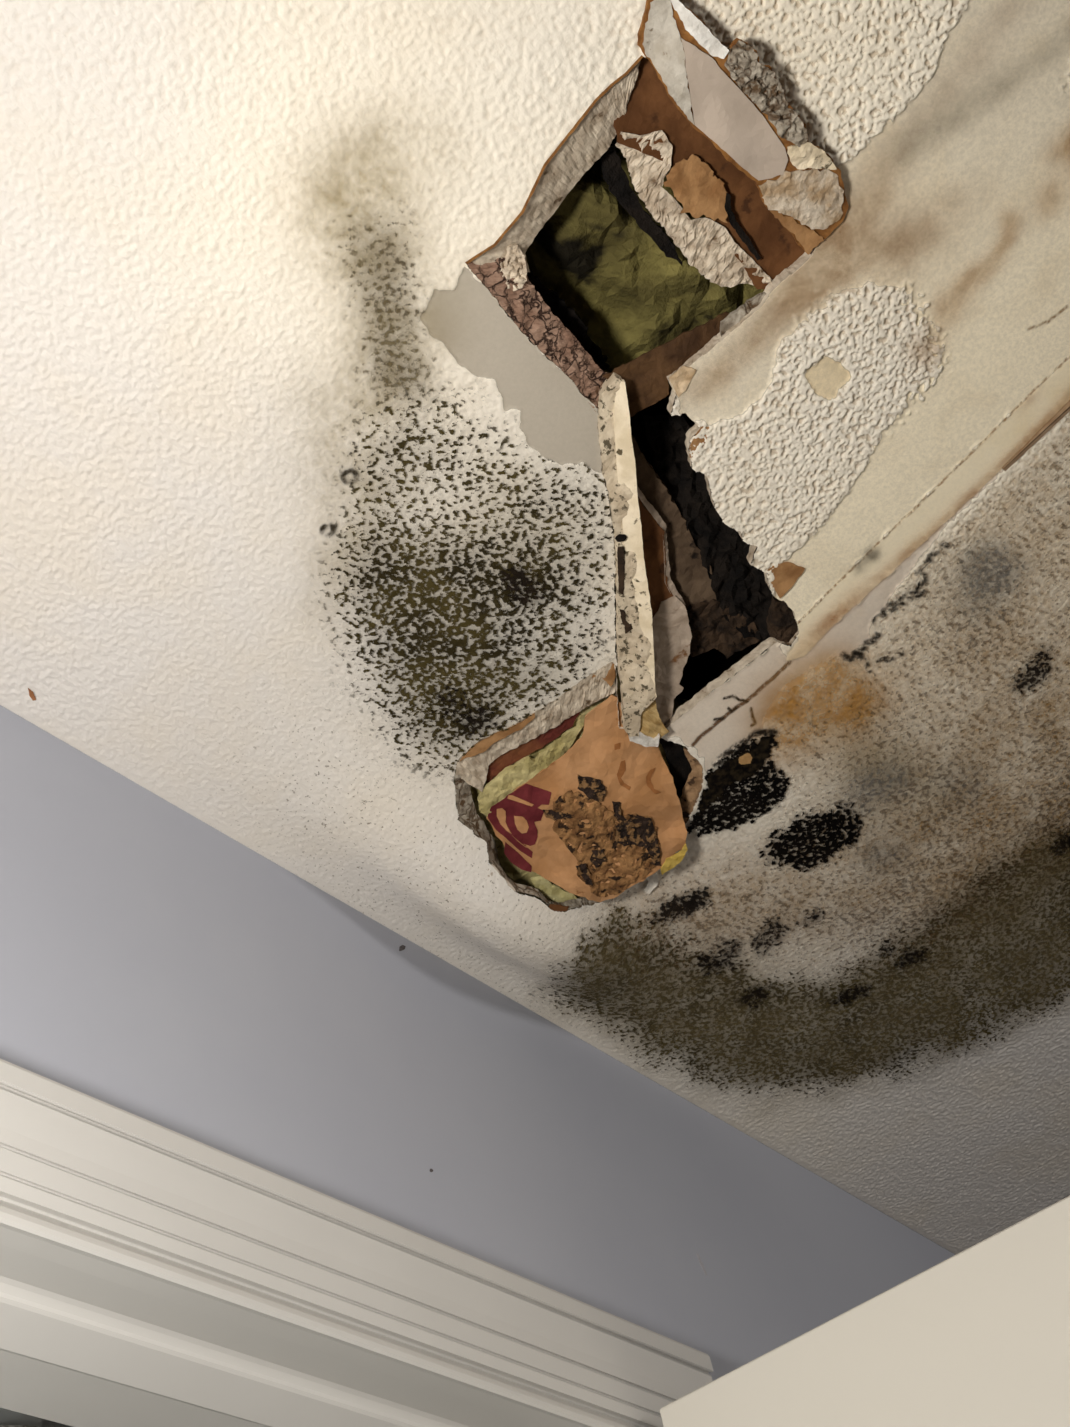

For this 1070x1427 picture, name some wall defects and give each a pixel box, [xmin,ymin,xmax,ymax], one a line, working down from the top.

leakage [323,186,615,778]
peeling [420,267,602,473]
leakage [534,439,1070,1098]
peeling [615,0,1070,623]
peeling [667,428,1052,771]